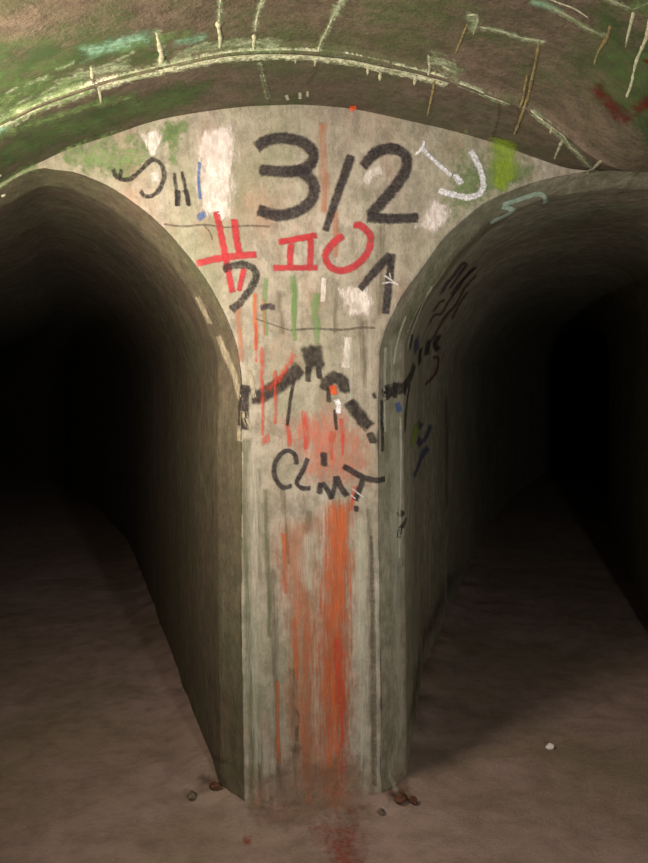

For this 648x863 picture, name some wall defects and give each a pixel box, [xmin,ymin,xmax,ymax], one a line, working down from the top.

corrosion [283,501,352,813]